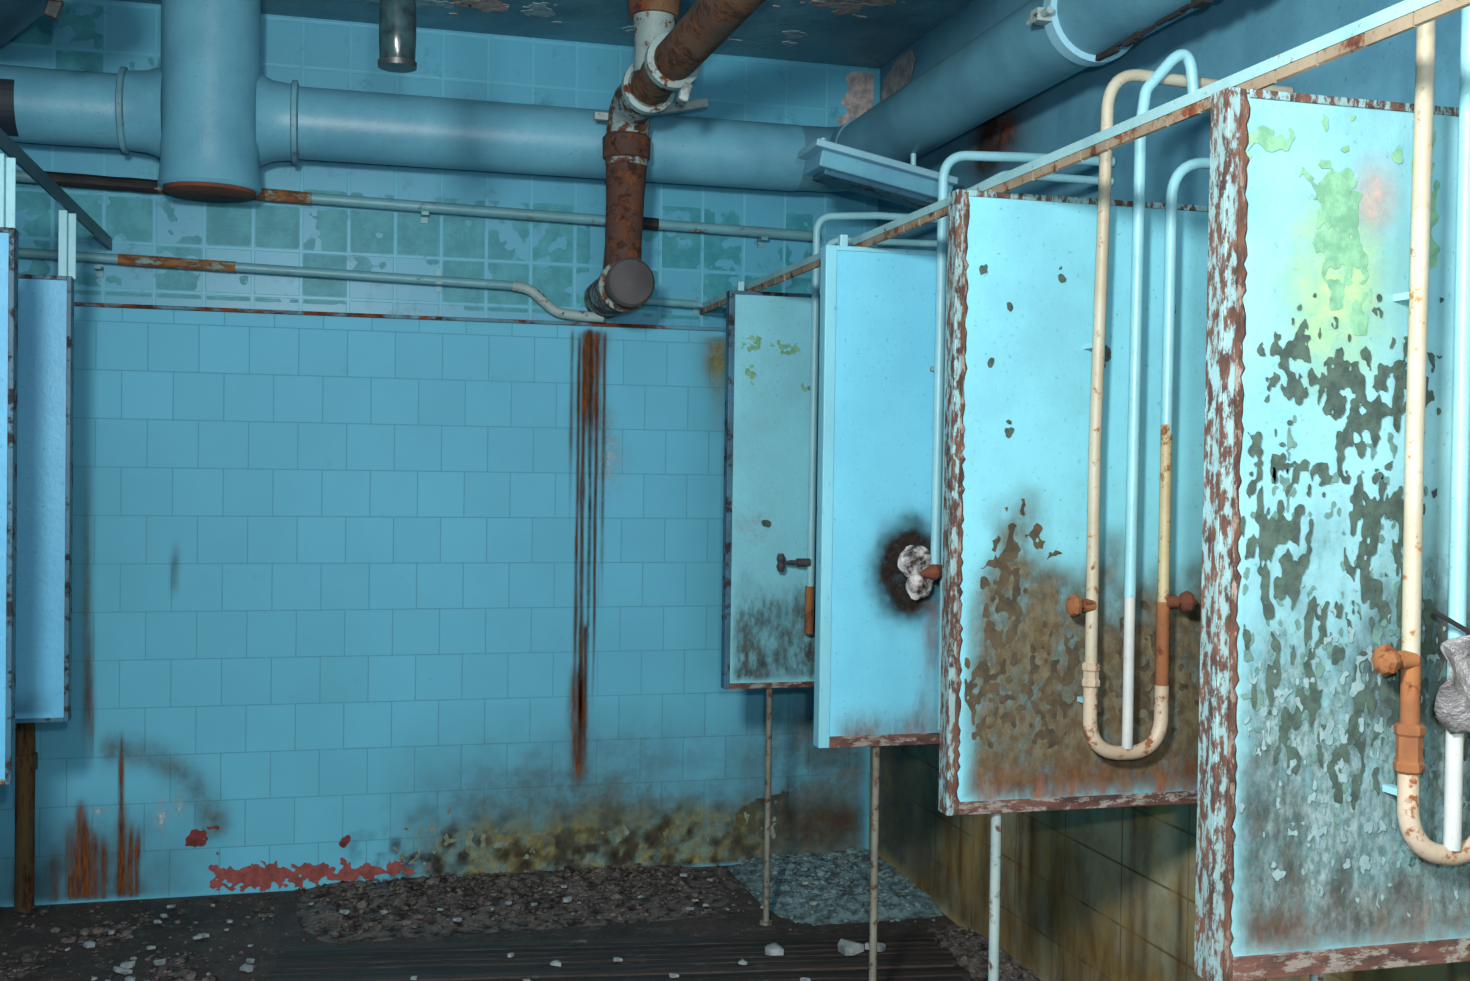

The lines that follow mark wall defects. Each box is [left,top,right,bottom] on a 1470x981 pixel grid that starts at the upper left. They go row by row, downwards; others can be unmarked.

peeling [415,0,561,23]
peeling [800,0,904,18]
peeling [1246,125,1295,159]
corrosion [570,330,606,777]
peeling [1240,131,1442,909]
corrosion [972,524,1202,800]
peeling [1420,570,1447,787]
corrosion [67,743,140,899]
peeling [185,808,538,892]
water stain [394,715,861,878]
water stain [879,745,986,925]
peeling [1462,738,1470,813]